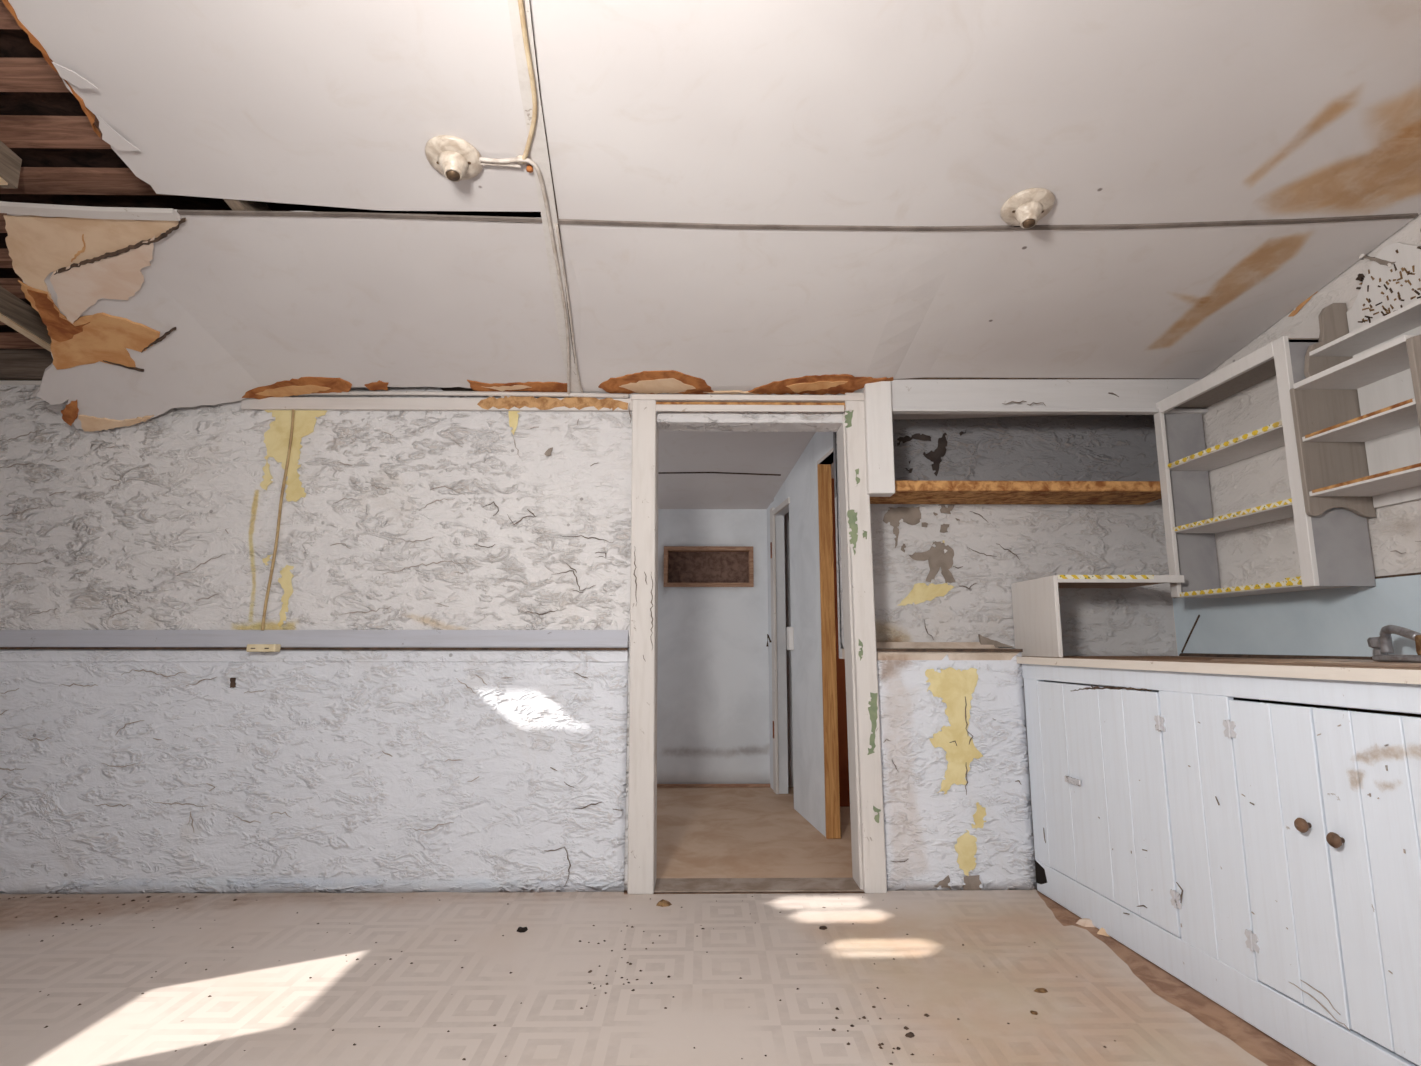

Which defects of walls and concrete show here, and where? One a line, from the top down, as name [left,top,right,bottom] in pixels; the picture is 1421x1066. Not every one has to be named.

peeling [1359,254,1395,268]
peeling [260,410,332,502]
peeling [896,428,967,476]
peeling [262,553,296,627]
peeling [883,504,960,606]
peeling [925,667,983,796]
peeling [934,800,987,890]